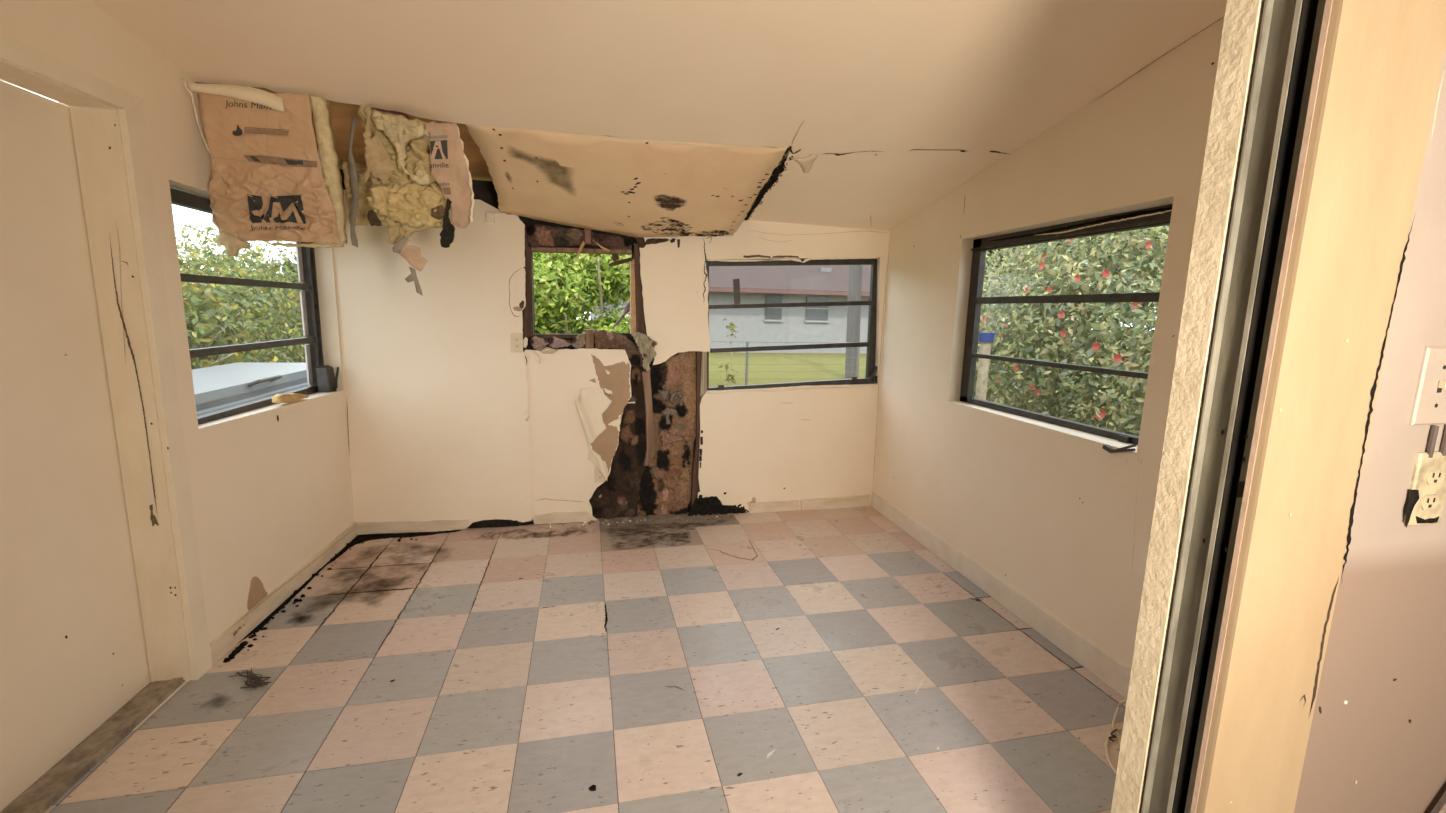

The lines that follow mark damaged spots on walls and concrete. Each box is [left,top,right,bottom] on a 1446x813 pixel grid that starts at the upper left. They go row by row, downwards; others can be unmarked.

damp [515,152,570,188]
damp [615,174,770,248]
crack [697,237,712,301]
crack [744,149,925,478]
spalling [576,351,707,519]
peeling [222,531,351,636]
damp [236,530,461,645]